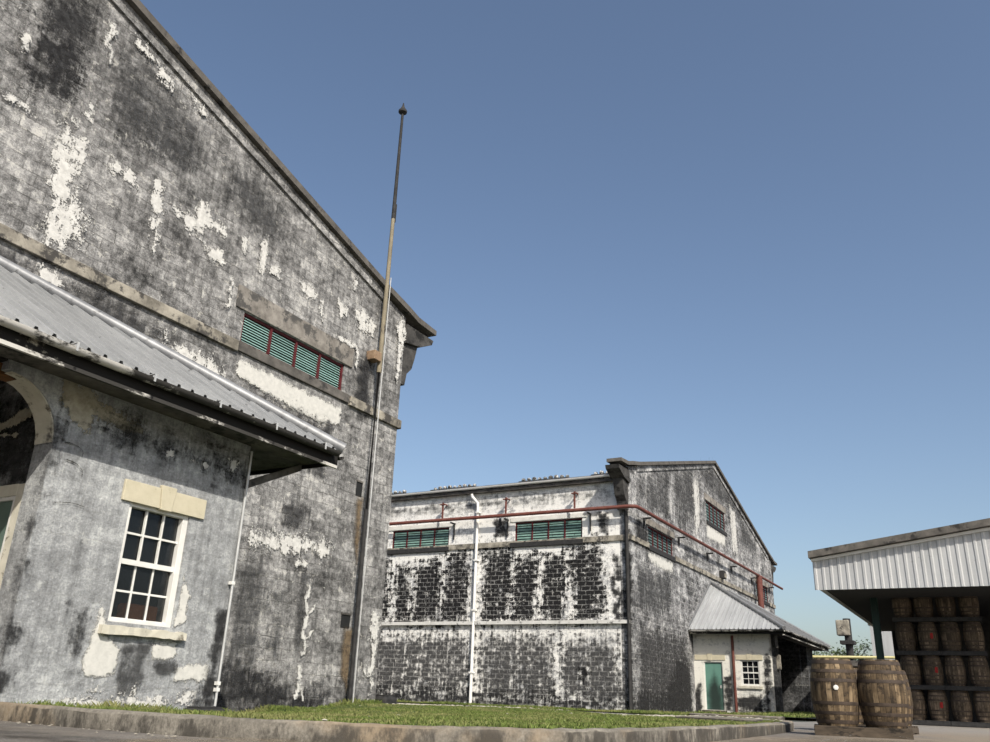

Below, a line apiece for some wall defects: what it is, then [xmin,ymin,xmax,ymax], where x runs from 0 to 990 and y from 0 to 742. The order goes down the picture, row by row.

peeling [18,28,32,53]
water stain [15,0,99,100]
peeling [103,20,176,92]
peeling [32,102,228,266]
peeling [27,261,65,287]
peeling [241,234,284,280]
peeling [161,328,226,378]
peeling [338,297,377,339]
water stain [639,471,758,555]
water stain [376,511,703,715]
peeling [81,607,209,695]
water stain [722,650,773,713]